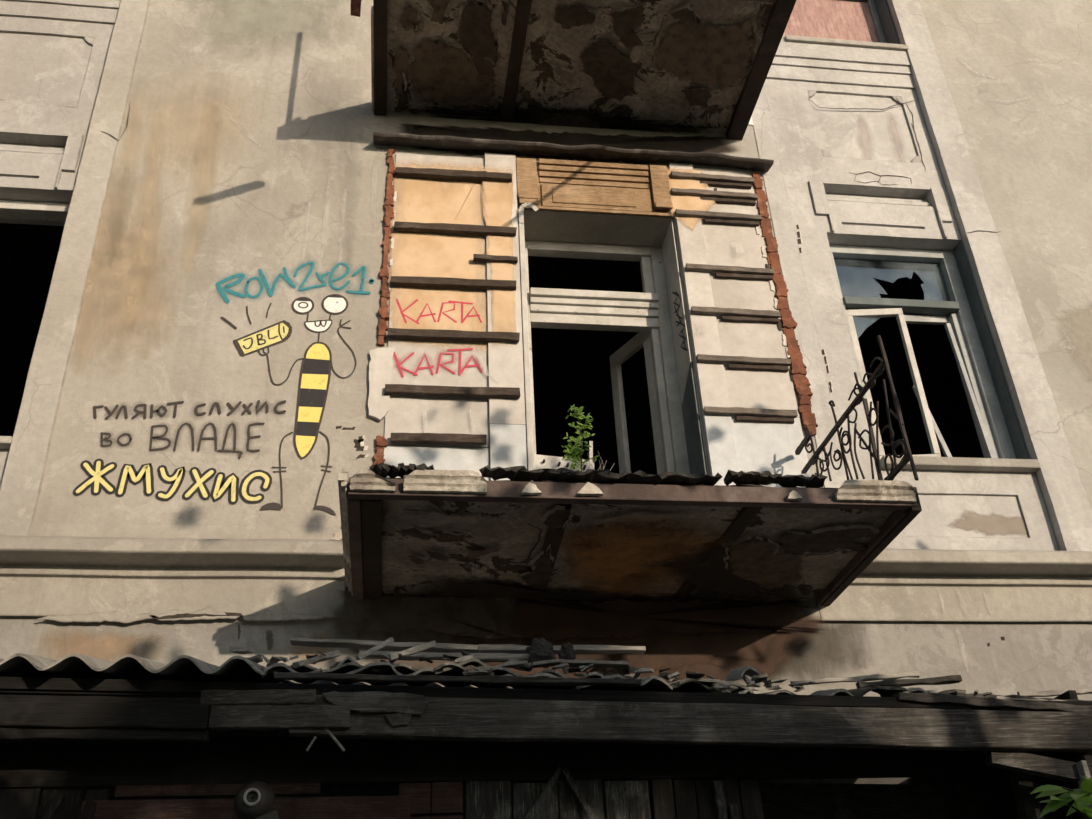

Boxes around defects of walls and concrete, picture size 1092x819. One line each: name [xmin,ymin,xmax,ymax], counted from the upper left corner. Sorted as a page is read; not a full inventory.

spalling [398,0,509,77]
spalling [555,6,598,31]
spalling [579,2,647,103]
spalling [539,113,604,129]
flaking render [368,148,397,422]
spalling [747,170,818,437]
flaking render [822,349,833,396]
spalling [336,426,388,466]
flaking render [952,512,1028,535]